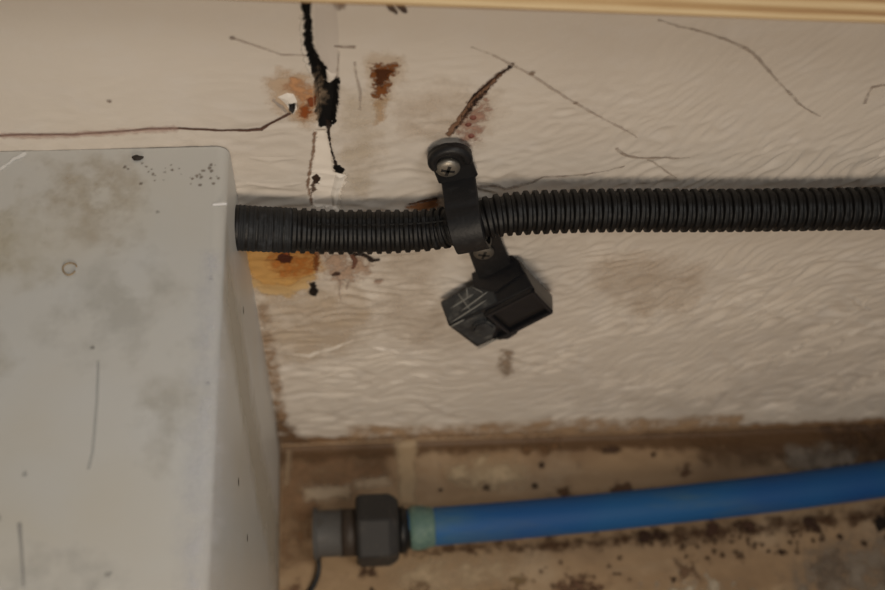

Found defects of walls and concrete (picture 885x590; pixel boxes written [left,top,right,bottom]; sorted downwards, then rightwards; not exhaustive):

crack [0,100,291,137]
corrosion [268,75,317,122]
crack [237,3,362,204]
corrosion [370,62,398,100]
crack [451,57,627,134]
crack [621,153,671,173]
damp [263,294,885,560]
damp [557,575,604,590]